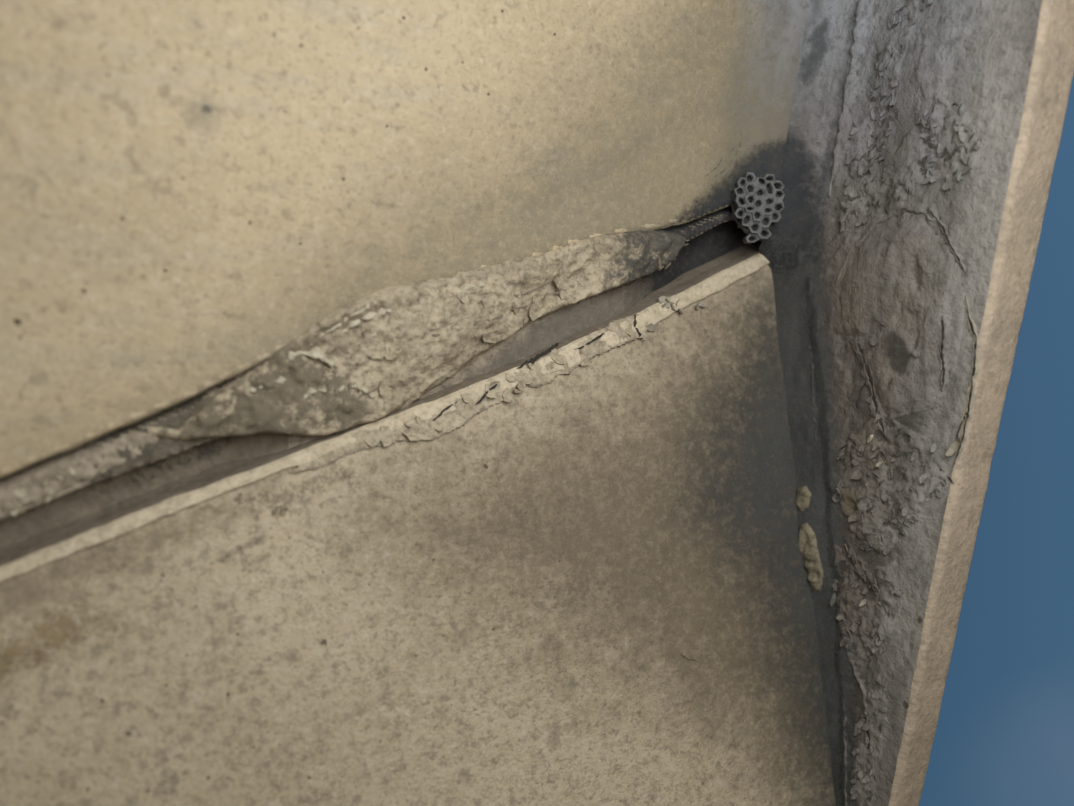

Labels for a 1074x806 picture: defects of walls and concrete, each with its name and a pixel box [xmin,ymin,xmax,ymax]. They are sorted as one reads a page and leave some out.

spalling [0,229,688,519]
peeling [658,296,708,314]
crack [853,330,887,436]
spalling [870,321,920,387]
crack [928,206,981,476]
peeling [795,409,961,667]
peeling [850,672,889,806]